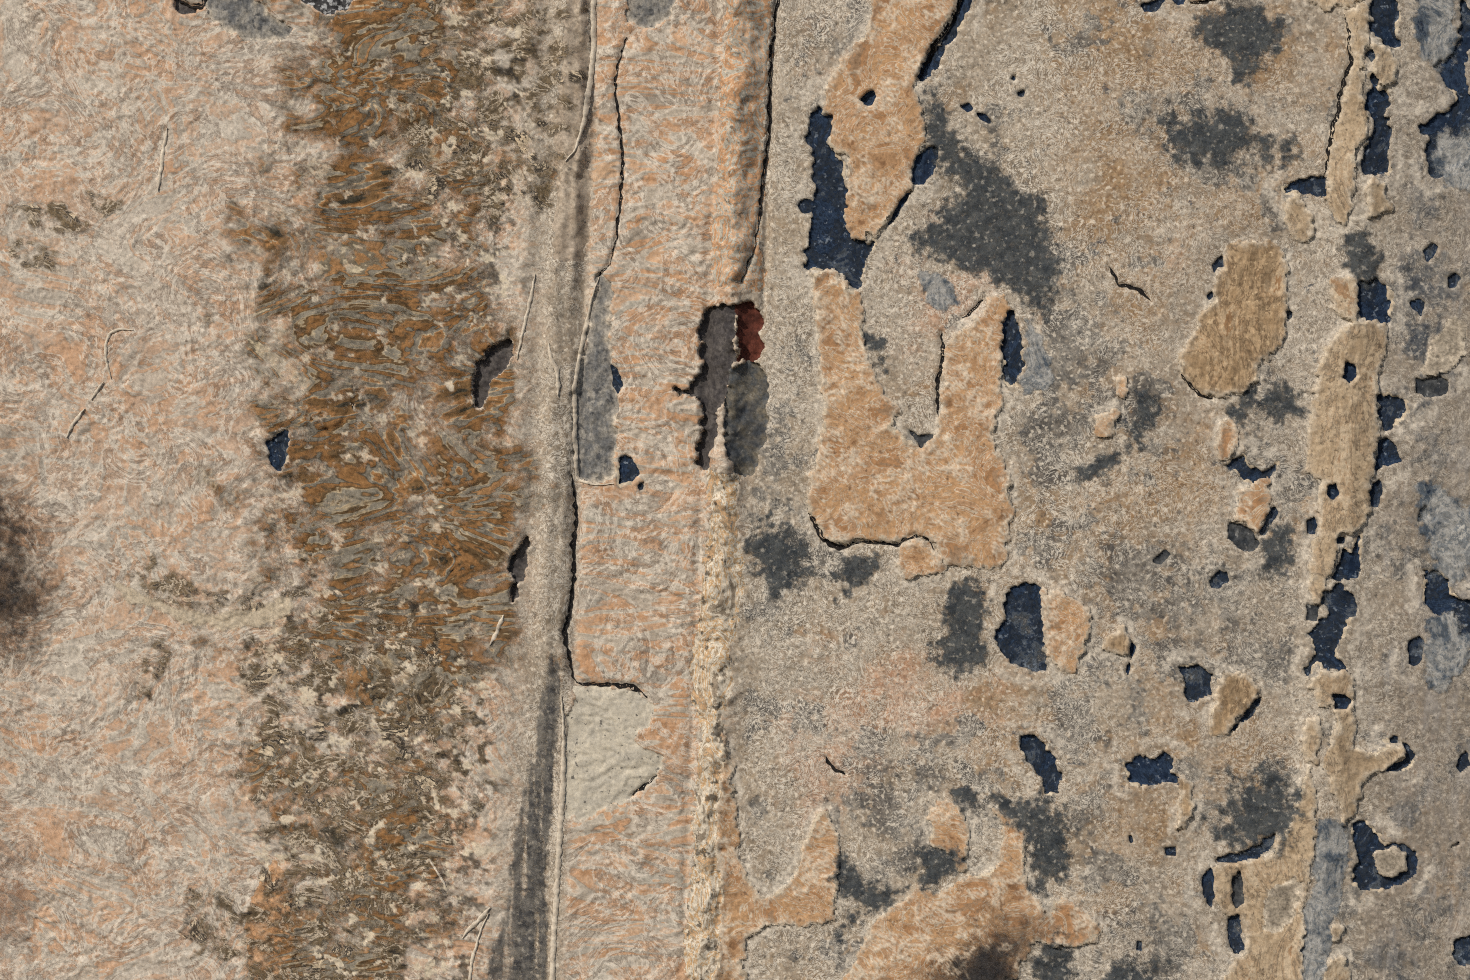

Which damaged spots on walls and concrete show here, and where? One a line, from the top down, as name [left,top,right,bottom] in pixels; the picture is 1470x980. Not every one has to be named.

water stain [384,82,521,238]
crack [598,37,627,277]
spalling [674,301,769,477]
crack [741,0,780,282]
peeling [798,0,1025,580]
peeling [1178,0,1401,398]
water stain [0,480,53,648]
crack [561,474,647,698]
peeling [1201,276,1425,980]
water stain [514,684,555,980]
peeling [843,799,1101,980]
water stain [953,947,1011,980]